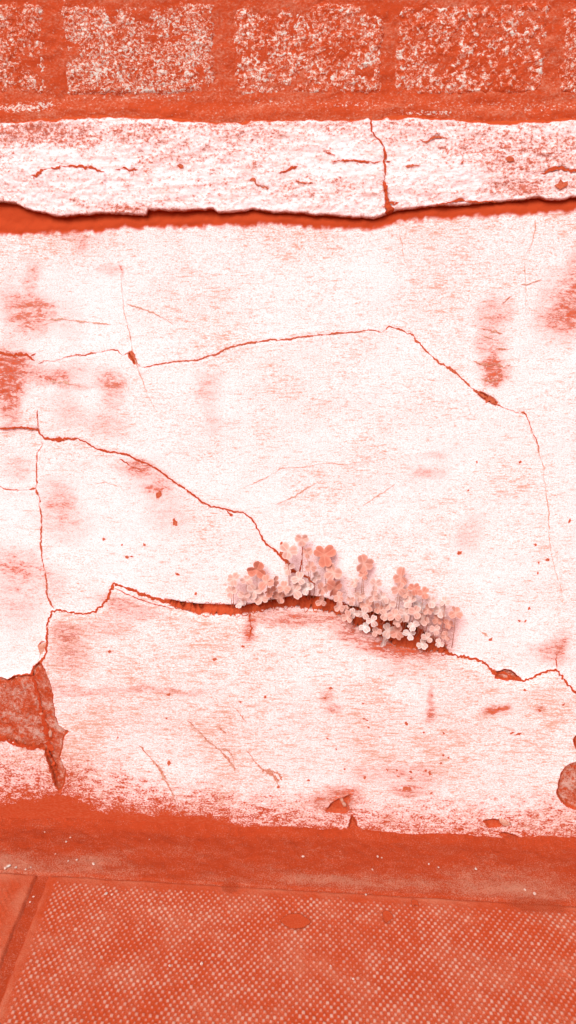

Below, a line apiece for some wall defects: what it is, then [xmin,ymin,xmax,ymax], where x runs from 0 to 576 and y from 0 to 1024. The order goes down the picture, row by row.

crack [326,116,447,269]
crack [0,282,562,591]
crack [0,412,576,694]
spalling [0,643,67,789]
spalling [558,762,576,807]